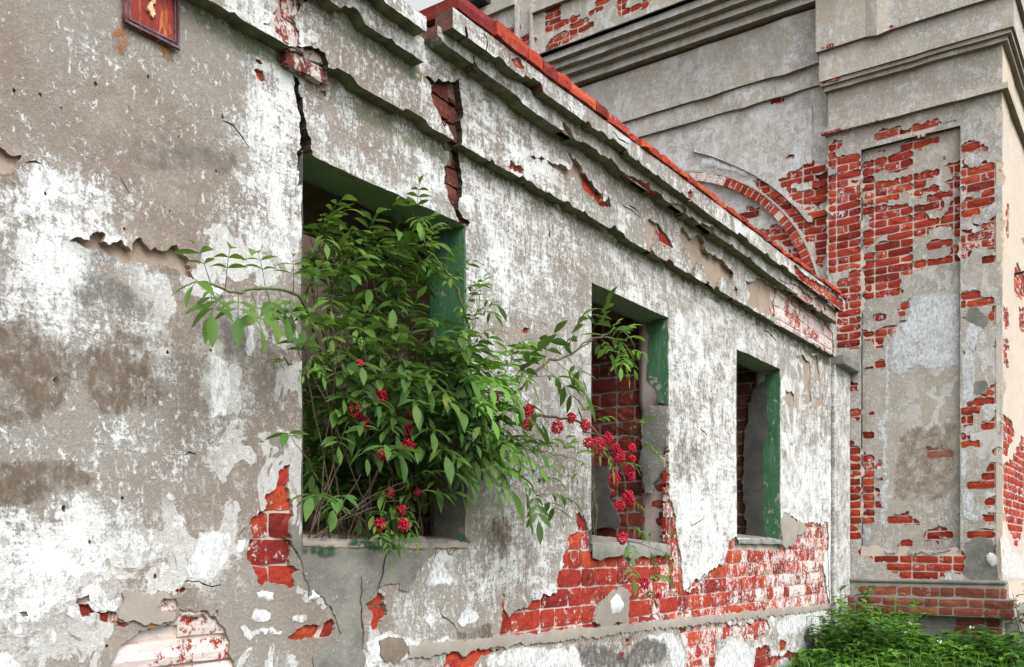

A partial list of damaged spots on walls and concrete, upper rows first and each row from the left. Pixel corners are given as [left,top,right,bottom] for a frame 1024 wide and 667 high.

crack [431,66,478,224]
peeling [530,152,611,207]
spalling [622,175,656,196]
peeling [70,233,188,277]
peeling [646,119,1008,408]
peeling [926,264,1024,555]
spalling [76,580,232,667]
spalling [247,465,297,588]
spalling [366,593,384,630]
spalling [500,450,828,667]
peeling [850,408,966,584]